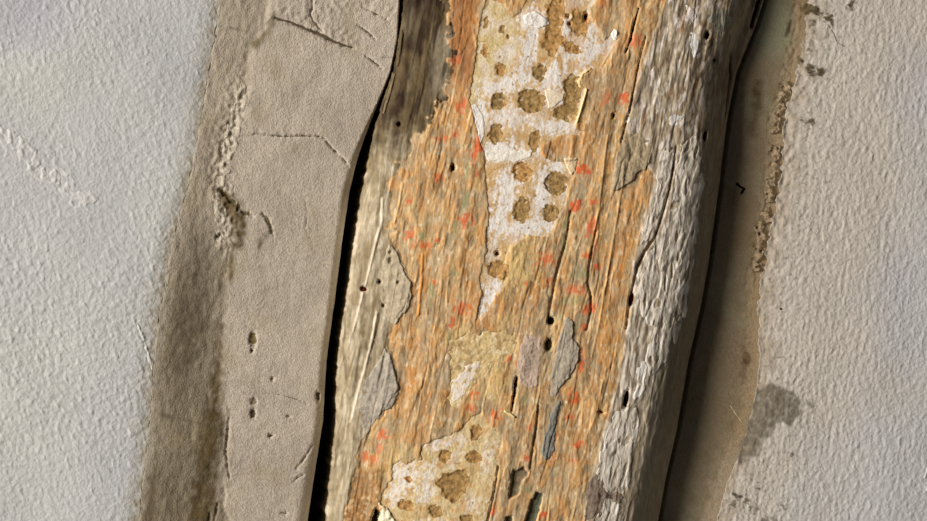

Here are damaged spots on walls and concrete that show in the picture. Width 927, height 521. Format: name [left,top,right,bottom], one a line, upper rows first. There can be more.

crack [275,0,387,67]
crack [264,135,347,163]
peeling [469,0,618,321]
leakage [190,376,220,521]
peeling [371,413,501,521]
leakage [738,384,799,464]